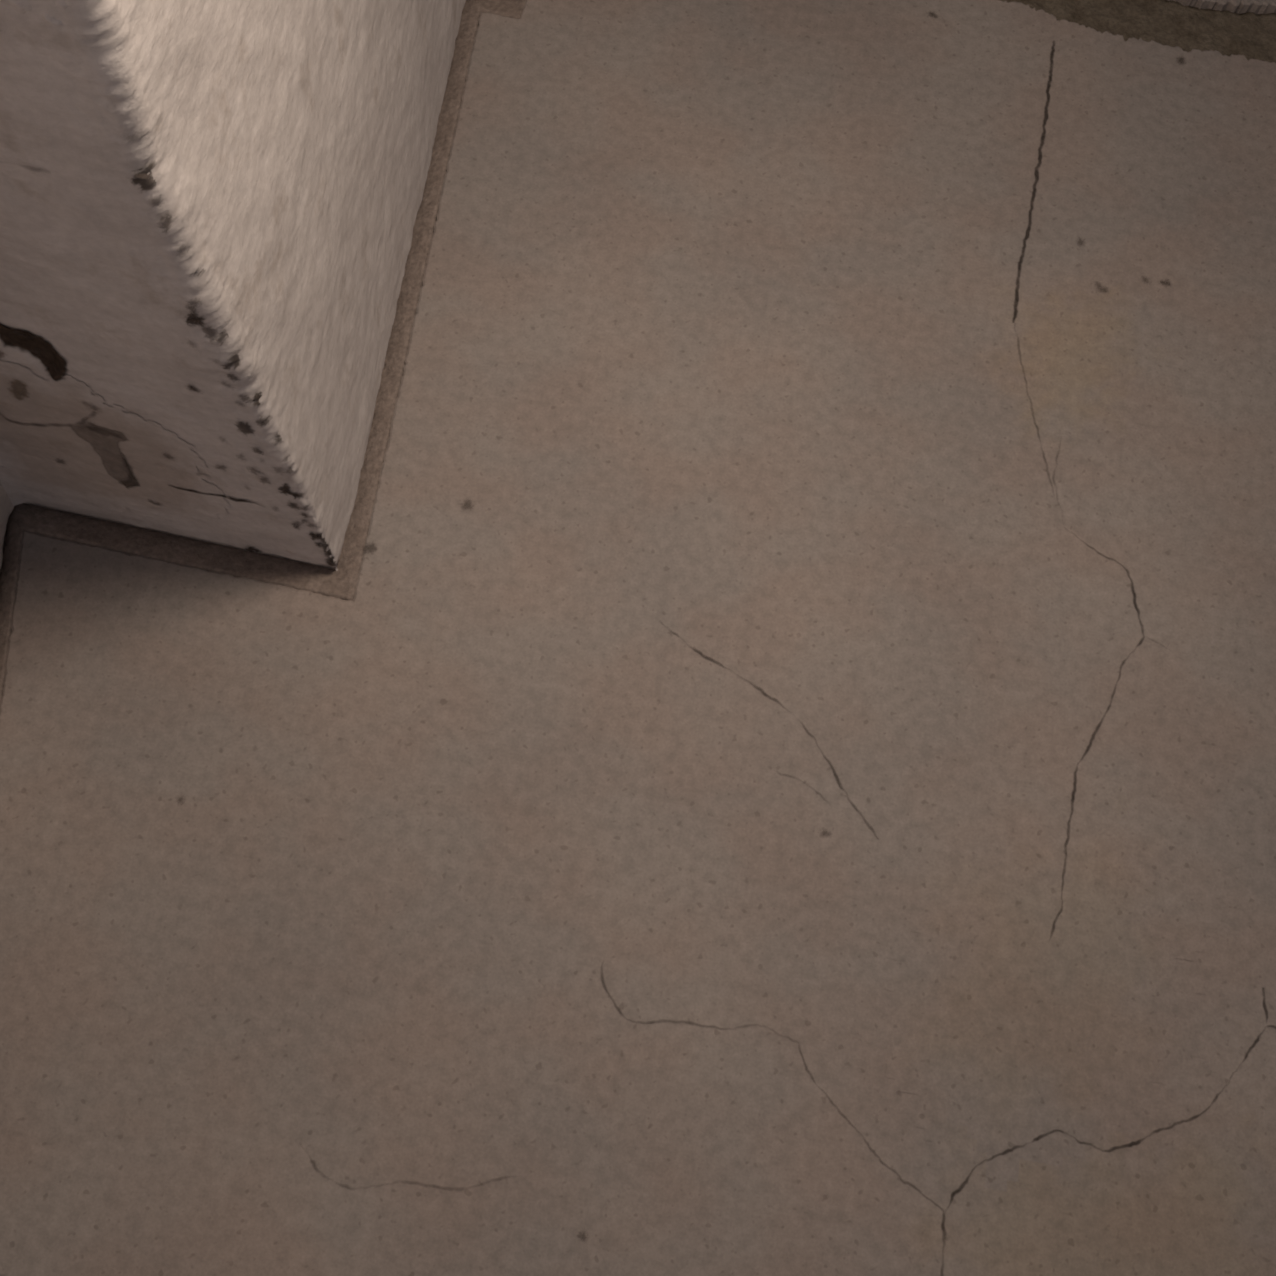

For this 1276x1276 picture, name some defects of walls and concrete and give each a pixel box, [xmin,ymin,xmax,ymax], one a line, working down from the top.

flaking render [133,164,156,190]
crack [1013,44,1055,322]
flaking render [0,324,67,381]
flaking render [186,307,229,344]
flaking render [222,354,240,381]
peeling [71,423,139,487]
flaking render [278,457,336,566]
crack [1122,585,1143,665]
crack [1072,706,1110,802]
crack [1246,1001,1276,1057]
crack [1110,1129,1161,1151]
crack [942,1180,967,1232]